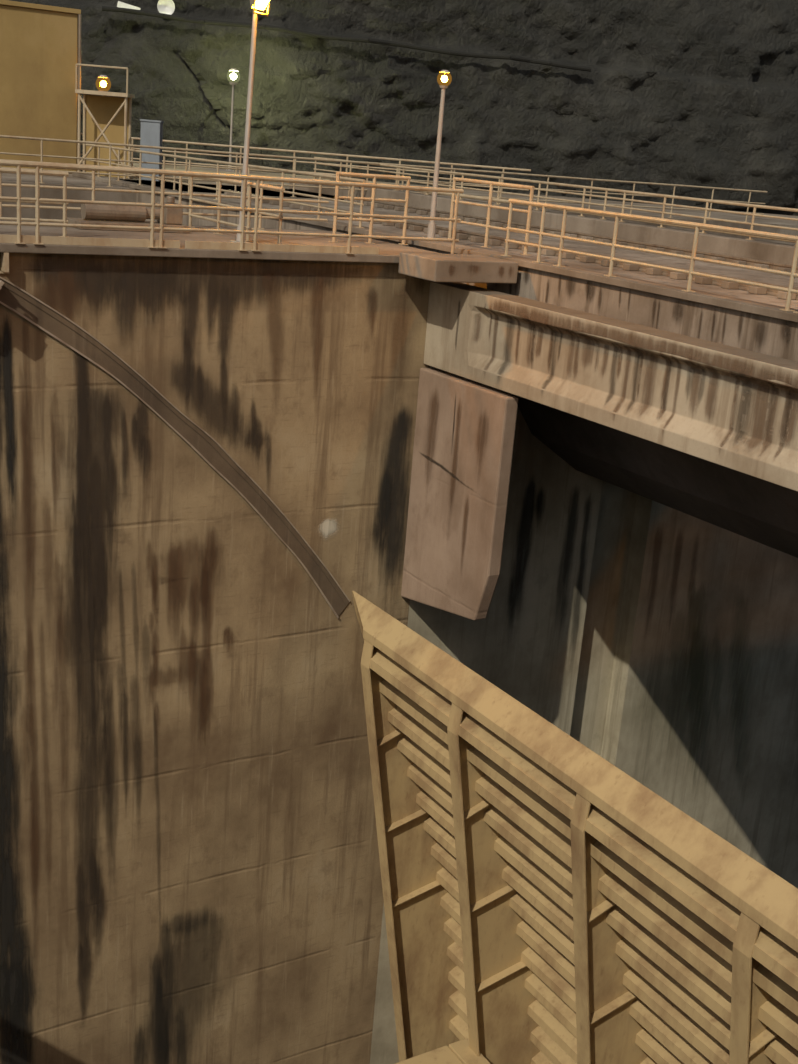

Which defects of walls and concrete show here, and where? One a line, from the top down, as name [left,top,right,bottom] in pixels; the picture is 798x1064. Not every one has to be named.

damp [491,268,798,454]
damp [373,410,411,576]
damp [509,481,543,618]
damp [562,492,590,635]
damp [0,321,32,1064]